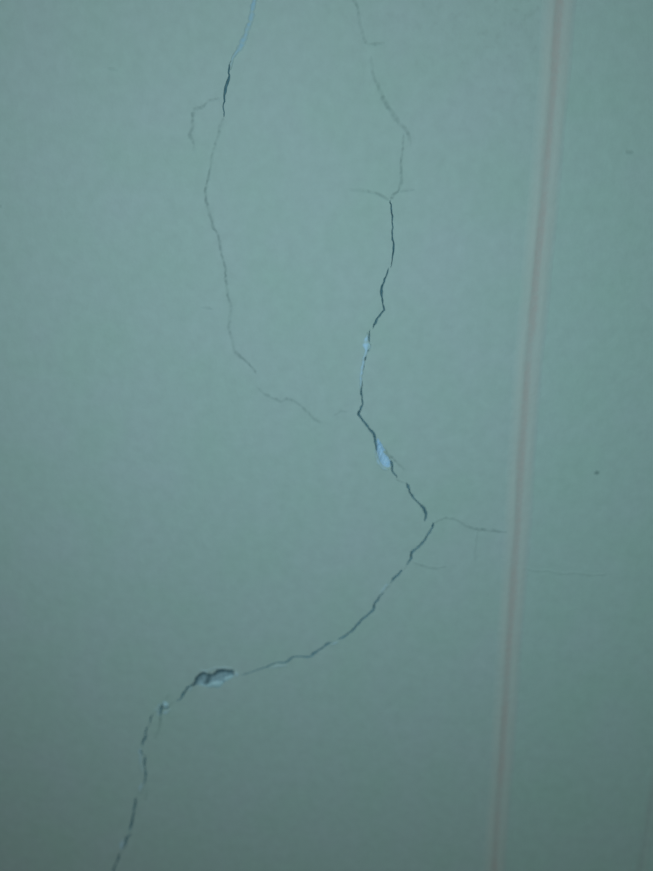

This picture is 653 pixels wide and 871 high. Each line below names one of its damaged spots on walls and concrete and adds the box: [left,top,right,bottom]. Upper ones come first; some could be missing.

crack [187,0,507,675]
crack [113,685,193,871]